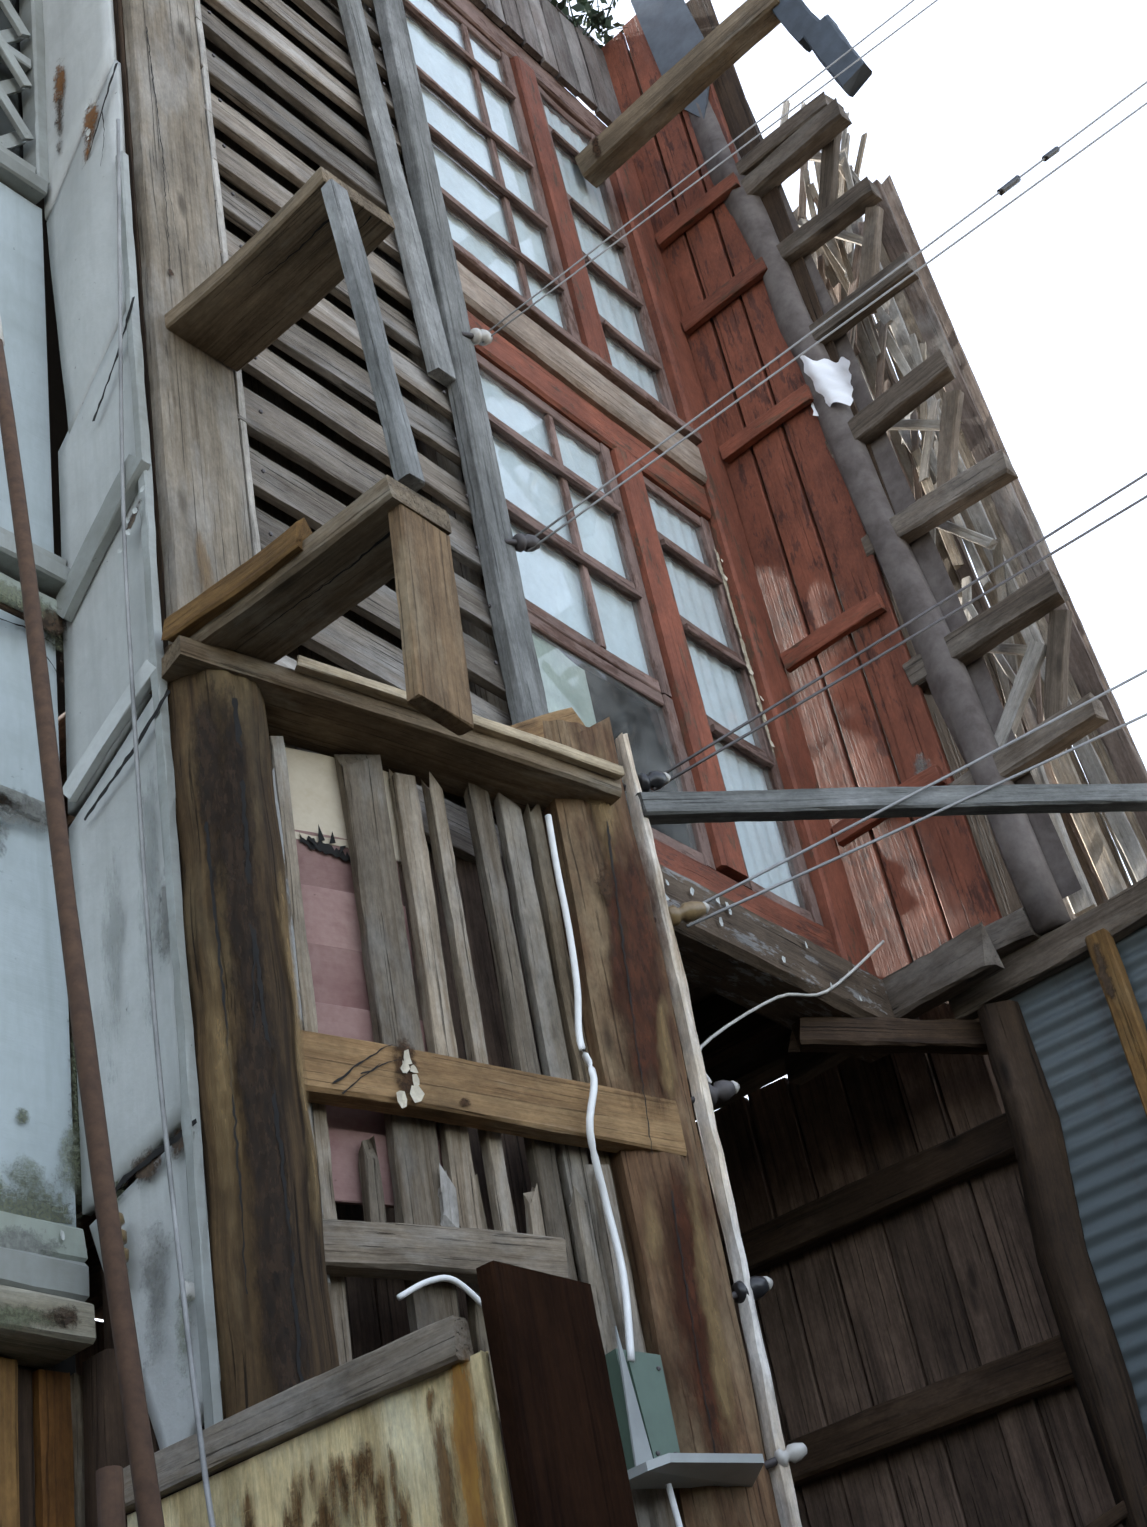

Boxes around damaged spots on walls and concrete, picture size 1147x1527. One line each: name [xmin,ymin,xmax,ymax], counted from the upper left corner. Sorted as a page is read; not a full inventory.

rust [53,64,65,152]
rust [83,99,99,161]
leakage [0,1038,82,1224]
rust [433,1361,499,1527]